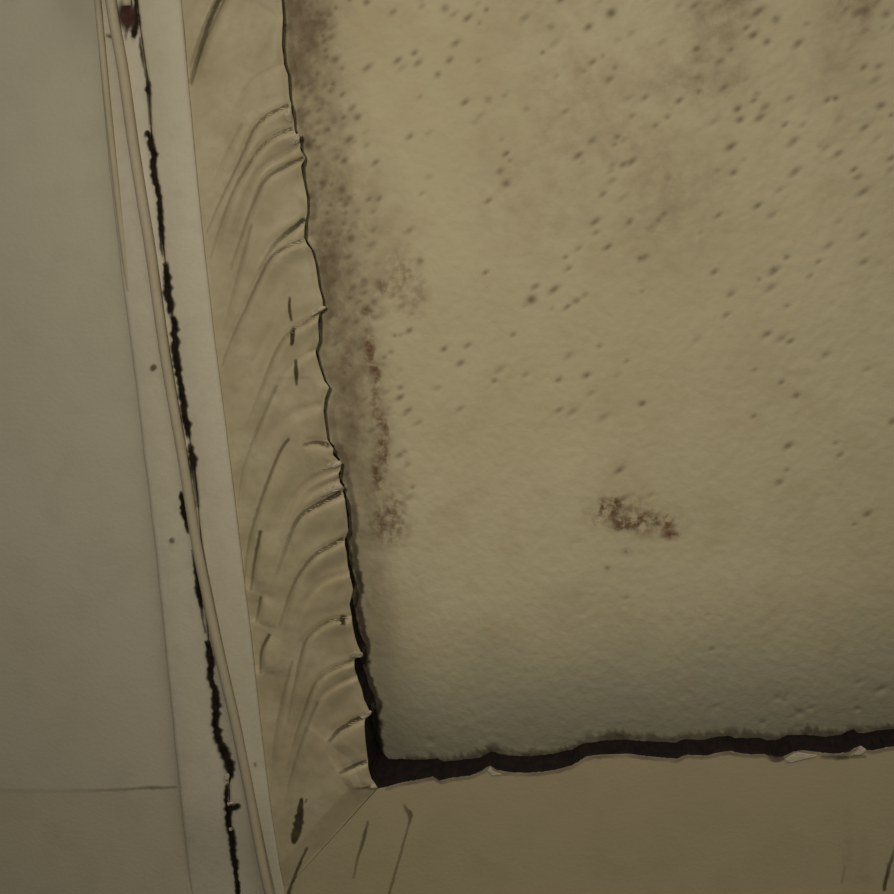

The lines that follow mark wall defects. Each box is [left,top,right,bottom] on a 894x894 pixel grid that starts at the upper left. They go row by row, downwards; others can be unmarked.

rust [118,4,136,32]
crack [131,0,203,616]
crack [204,640,240,894]
crack [287,798,306,894]
crack [882,864,890,890]